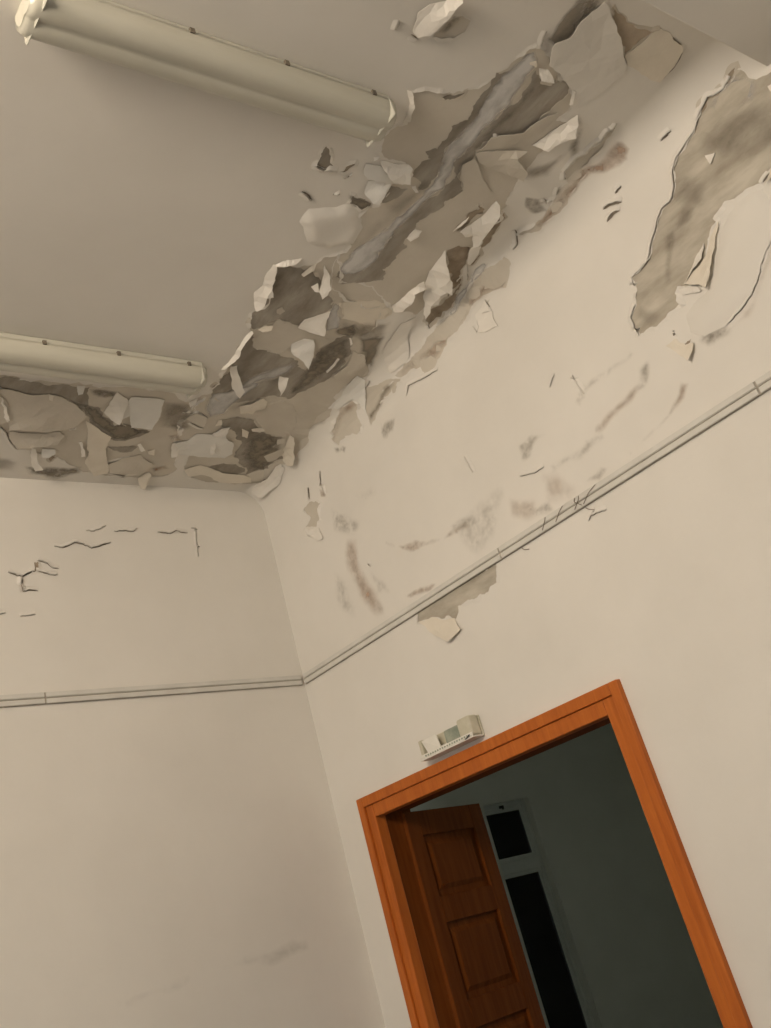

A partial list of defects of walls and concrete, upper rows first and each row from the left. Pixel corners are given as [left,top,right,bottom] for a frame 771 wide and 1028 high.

peeling [0,0,683,489]
peeling [627,61,771,360]
crack [0,523,200,617]
peeling [416,563,500,642]